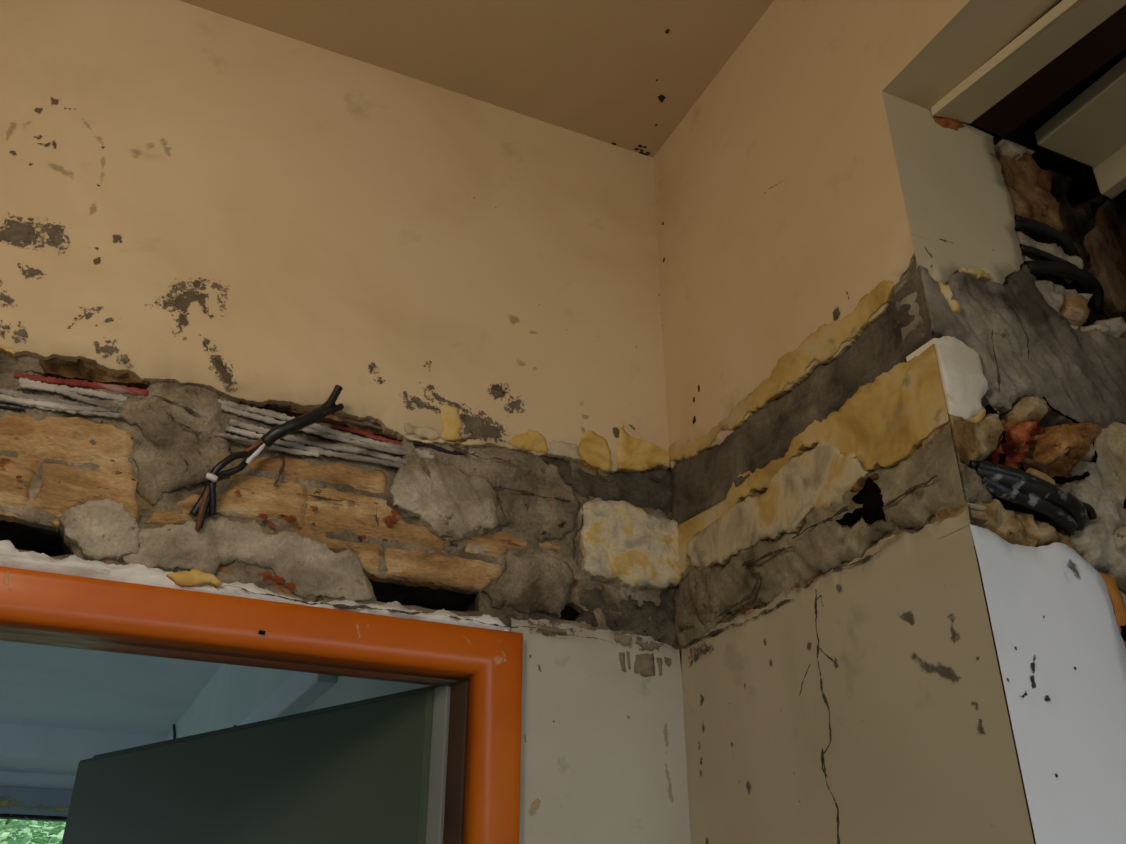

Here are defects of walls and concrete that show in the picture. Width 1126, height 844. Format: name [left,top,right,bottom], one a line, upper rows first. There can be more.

peeling [0,212,71,254]
flaking render [994,139,1107,272]
peeling [17,263,46,279]
flaking render [1032,274,1106,327]
flaking render [0,277,1077,677]
crack [882,475,937,508]
spalling [1081,422,1126,506]
peeling [1099,572,1126,642]
crack [682,506,881,844]